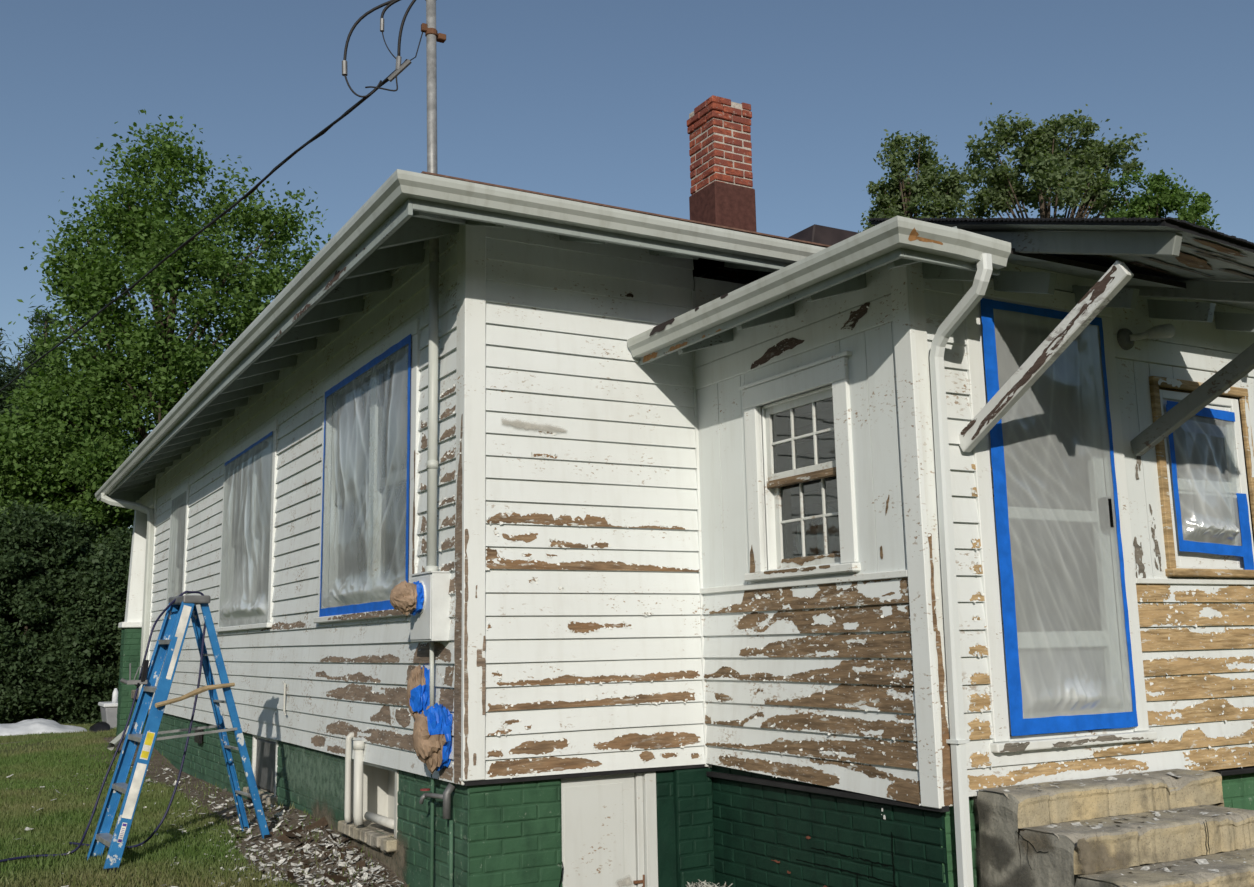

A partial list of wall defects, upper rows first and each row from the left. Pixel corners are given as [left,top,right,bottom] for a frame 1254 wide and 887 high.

peeling [649,318,675,336]
peeling [643,342,688,363]
peeling [751,337,804,369]
peeling [841,302,870,331]
peeling [961,239,1254,440]
peeling [311,384,921,815]
peeling [260,621,305,632]
peeling [967,504,1254,792]
peeling [928,533,954,806]
peeling [1046,807,1232,849]
peeling [1121,853,1254,883]